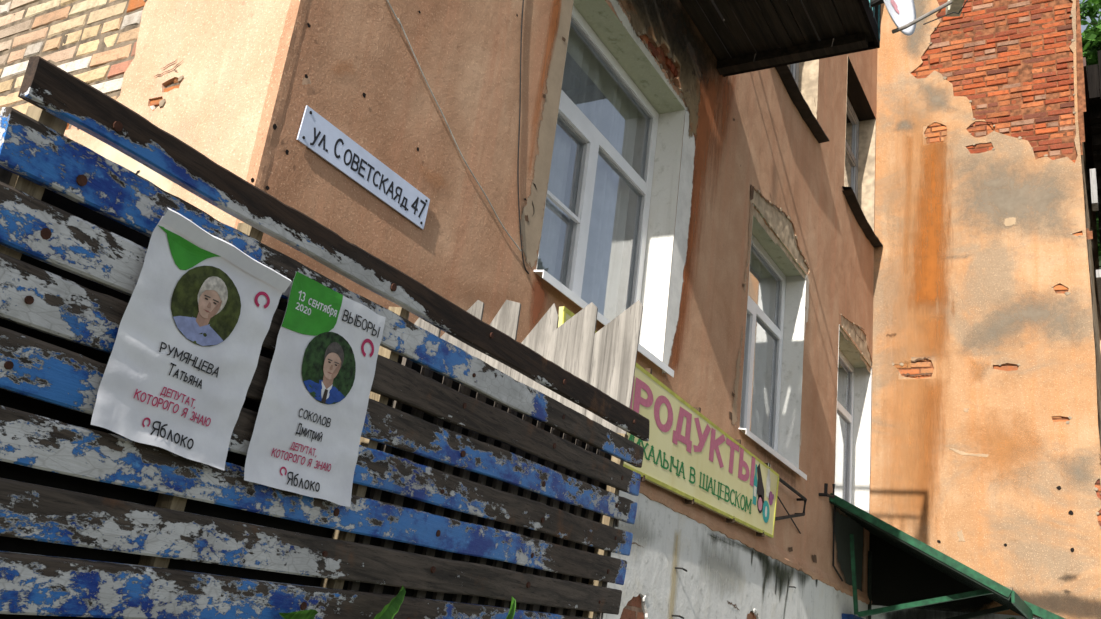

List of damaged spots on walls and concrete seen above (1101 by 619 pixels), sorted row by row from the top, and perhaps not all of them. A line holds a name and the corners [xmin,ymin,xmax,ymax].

flaking render [0,0,147,114]
flaking render [150,75,184,111]
peeling [519,0,574,268]
peeling [620,0,701,139]
flaking render [911,0,1086,163]
water stain [966,166,1064,227]
corrosion [898,131,945,511]
water stain [985,298,1072,341]
flaking render [892,359,934,379]
flaking render [620,595,647,619]
water stain [710,533,817,615]